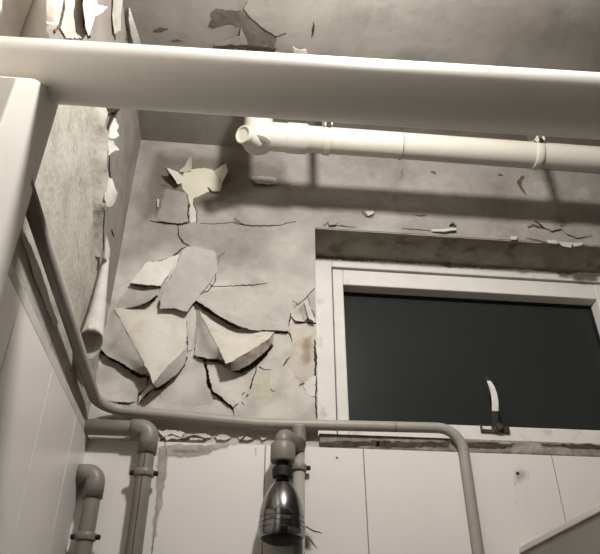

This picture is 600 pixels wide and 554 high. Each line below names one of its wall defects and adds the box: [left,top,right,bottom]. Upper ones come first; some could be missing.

peeling [45,0,141,44]
flaking render [208,0,286,52]
crack [150,217,296,246]
flaking render [526,221,592,248]
peeling [81,107,317,418]
peeling [158,430,268,441]